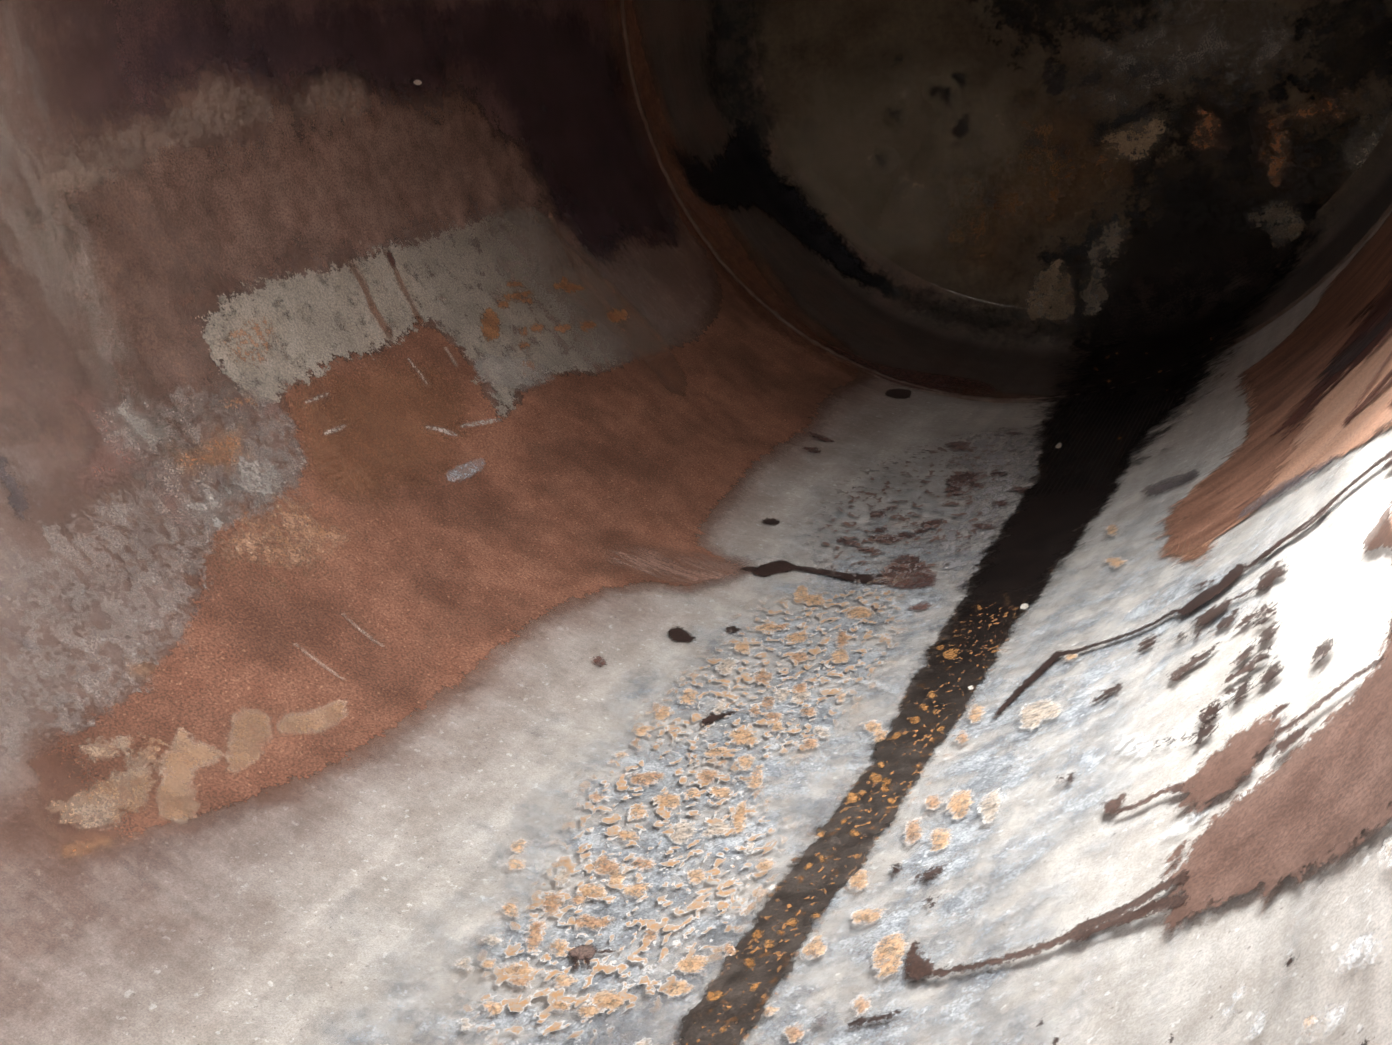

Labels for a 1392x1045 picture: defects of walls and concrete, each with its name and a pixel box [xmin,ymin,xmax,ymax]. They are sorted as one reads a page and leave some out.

peeling [0,211,663,828]
rust [0,0,1051,852]
rust [455,431,1030,1044]
water stain [423,0,1392,1045]
rust [1019,698,1064,730]
rust [1257,94,1353,186]
rust [1379,840,1392,867]